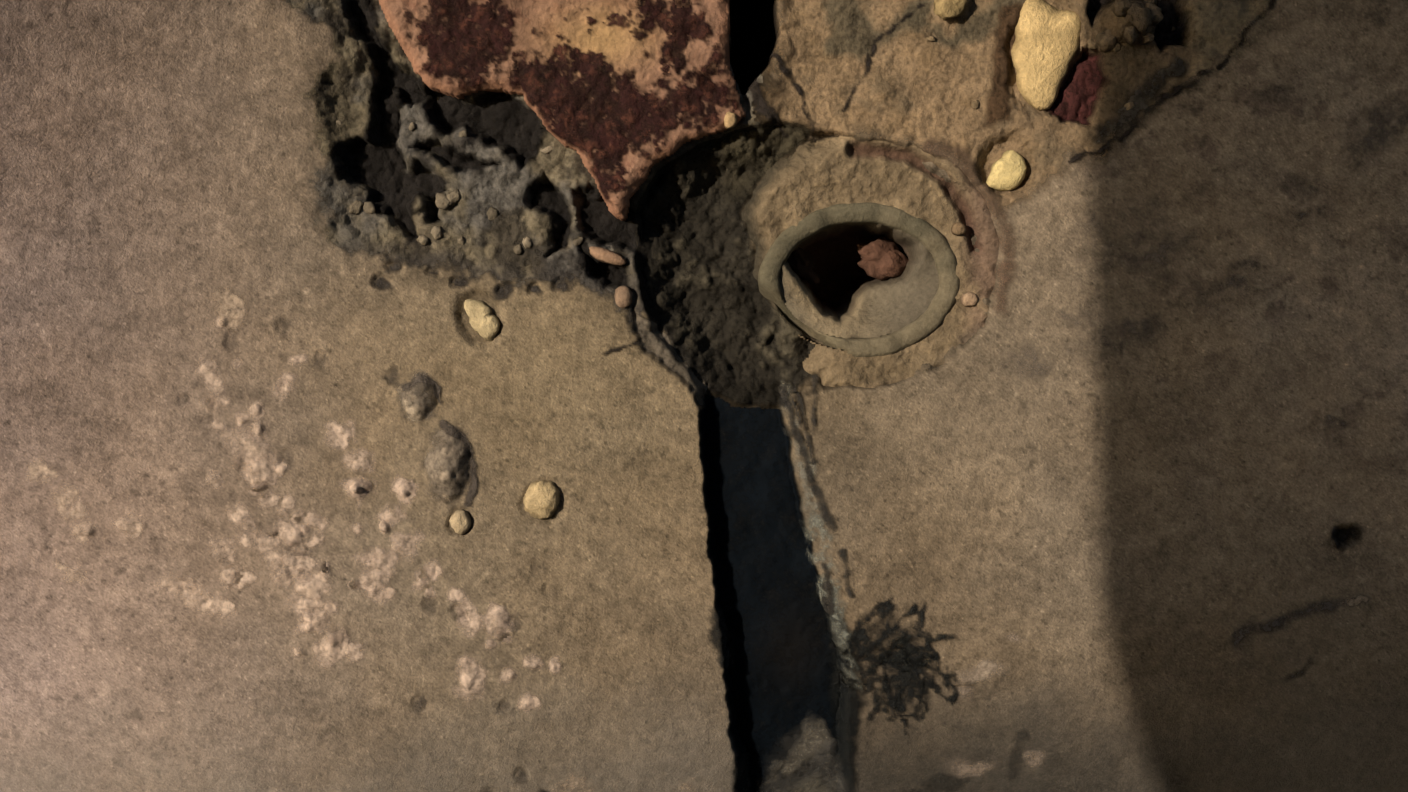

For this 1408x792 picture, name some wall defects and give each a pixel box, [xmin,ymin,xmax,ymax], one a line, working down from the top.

rust [403,0,738,200]
spalling [285,0,1269,341]
efflorescence [161,355,362,667]
efflorescence [327,421,371,501]
efflorescence [355,478,424,601]
efflorescence [414,563,509,649]
water stain [700,374,1116,792]
efflorescence [456,656,560,696]
efflorescence [518,694,540,711]